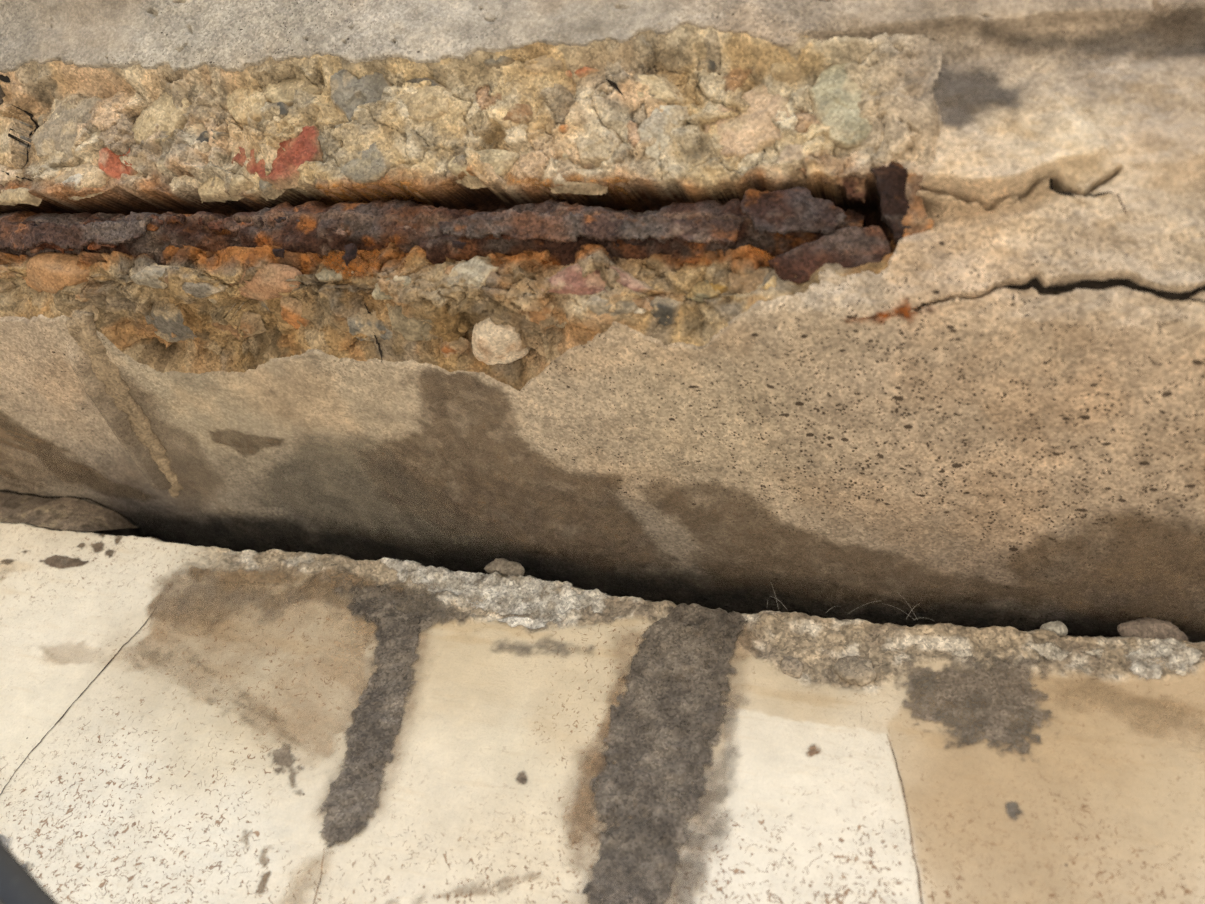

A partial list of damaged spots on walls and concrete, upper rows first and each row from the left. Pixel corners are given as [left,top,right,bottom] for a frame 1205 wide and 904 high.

rust [315,181,432,206]
spalling [0,23,942,391]
rust [508,174,635,205]
crack [1049,179,1115,197]
rust [322,248,382,277]
crack [922,278,1205,306]
water stain [0,412,150,500]
water stain [133,369,1205,904]